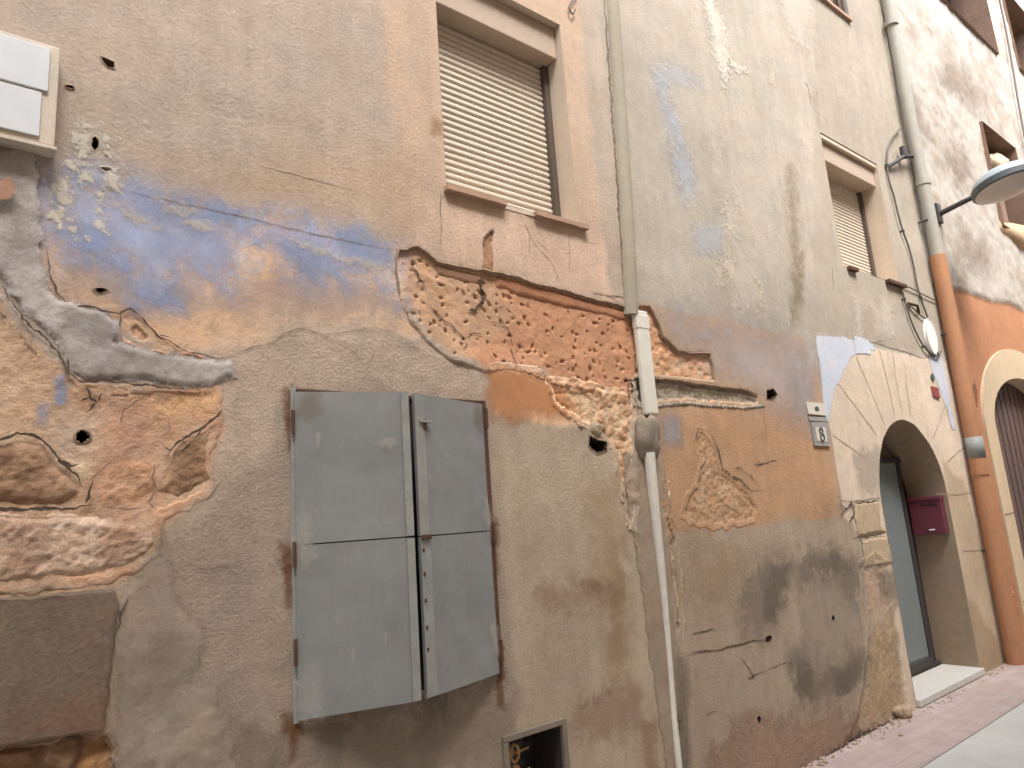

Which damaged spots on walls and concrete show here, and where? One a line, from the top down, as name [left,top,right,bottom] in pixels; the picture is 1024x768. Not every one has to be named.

peeling [701,0,748,93]
crack [122,190,385,249]
flaking render [39,124,778,410]
flaking render [0,294,225,594]
hole [588,434,608,455]
flaking render [665,424,760,648]
crack [688,629,791,679]
water stain [801,565,861,675]